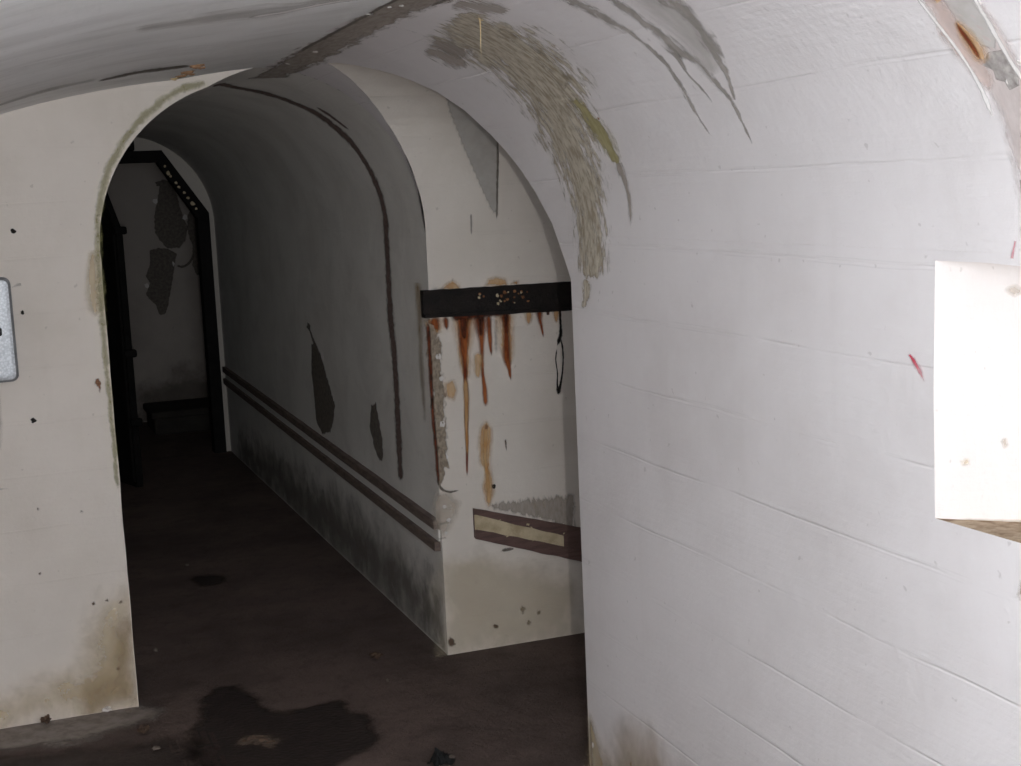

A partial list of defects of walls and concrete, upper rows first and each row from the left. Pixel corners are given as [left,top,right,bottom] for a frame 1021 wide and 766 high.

peeling [918,0,1021,186]
spalling [425,319,458,493]
corrosion [430,314,511,473]
corrosion [480,424,492,503]
corrosion [527,311,558,335]